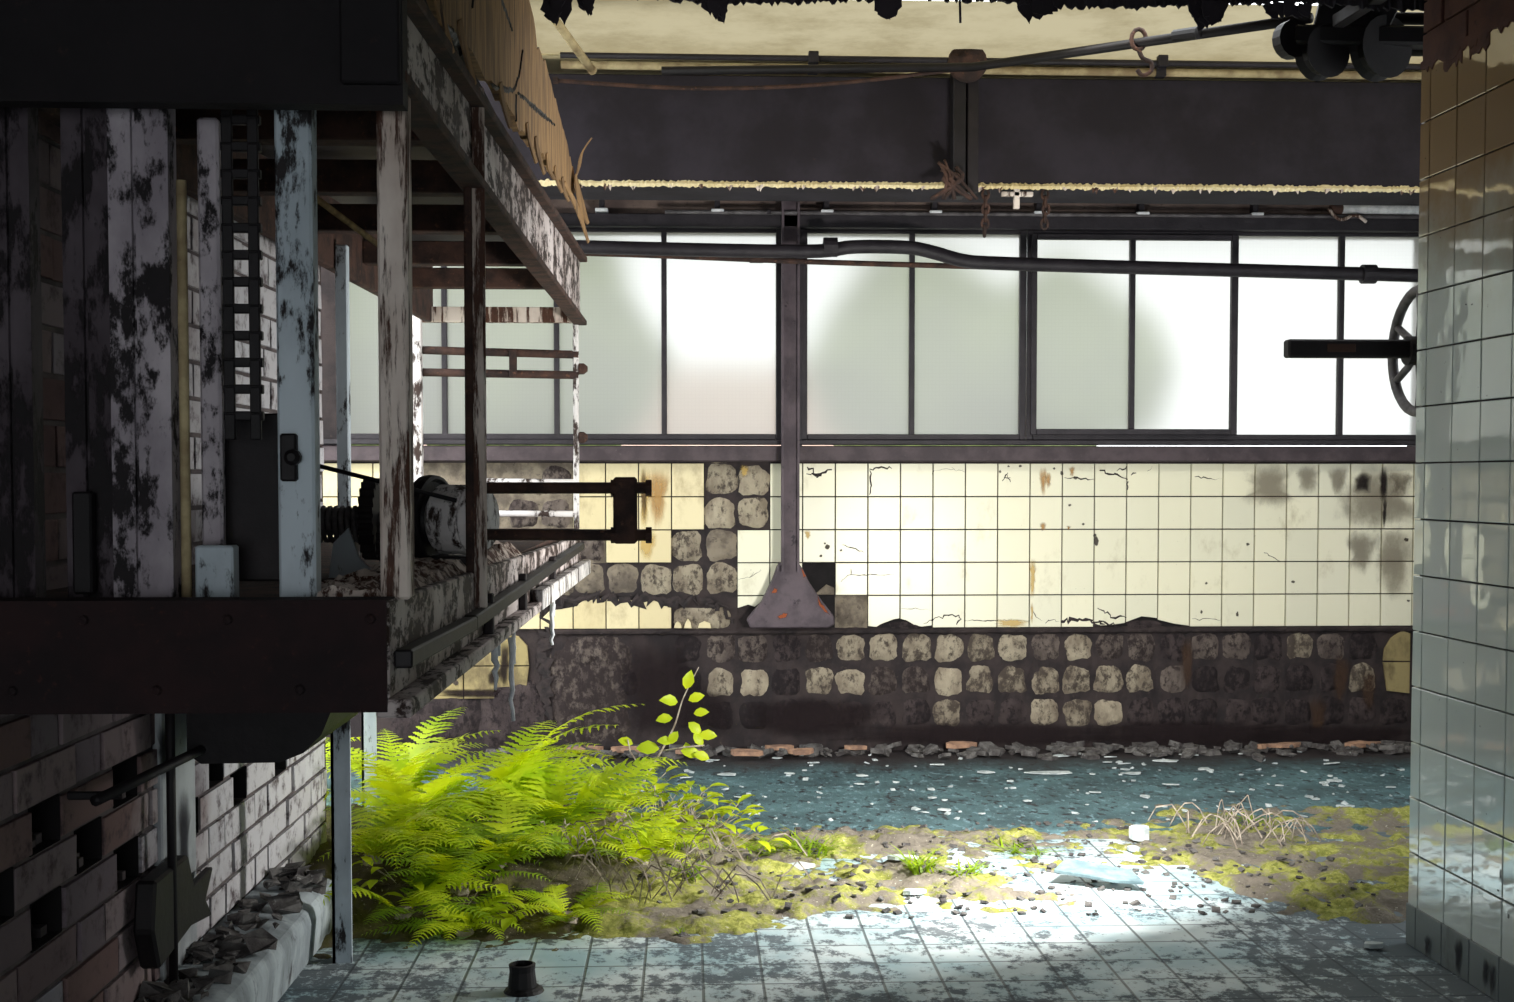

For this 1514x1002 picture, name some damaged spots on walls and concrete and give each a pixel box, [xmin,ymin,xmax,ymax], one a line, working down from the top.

peeling [540,0,595,26]
peeling [657,0,902,23]
peeling [927,0,1427,31]
peeling [1420,10,1514,72]
crack [806,467,832,478]
crack [869,466,892,495]
crack [1064,466,1151,490]
rust [641,478,666,517]
damp [1356,471,1387,524]
crack [844,545,1127,628]